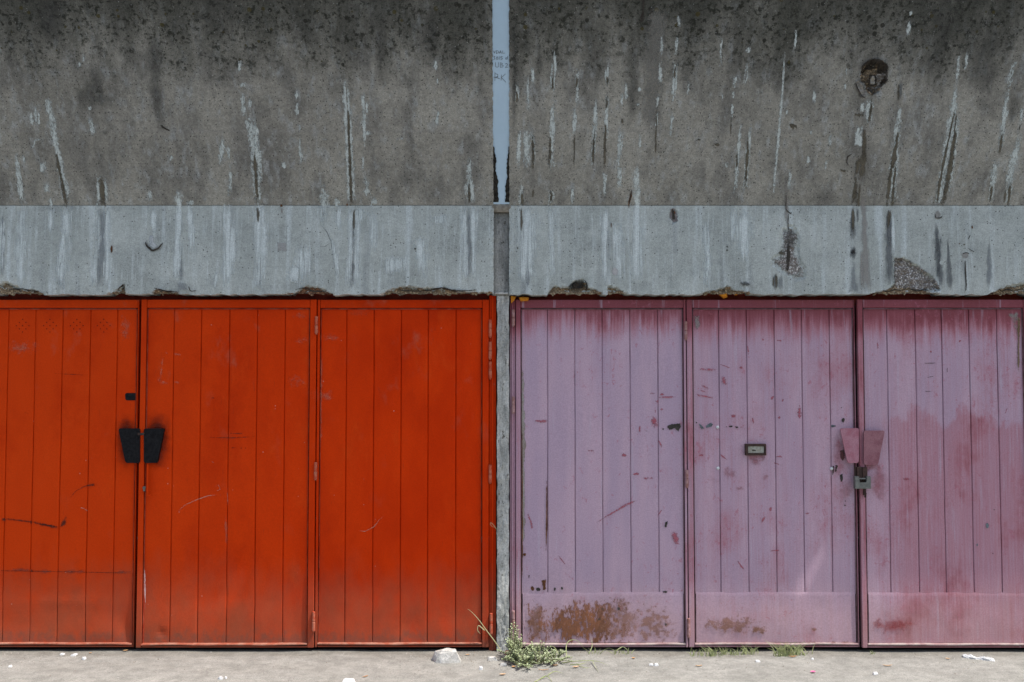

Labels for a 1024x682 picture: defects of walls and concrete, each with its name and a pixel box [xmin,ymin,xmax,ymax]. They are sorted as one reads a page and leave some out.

damp [238,61,267,285]
damp [319,81,377,282]
spalling [385,287,492,296]
spalling [549,280,624,296]
damp [591,14,689,279]
spalling [773,229,804,277]
damp [846,101,874,290]
damp [886,84,902,278]
spalling [873,258,939,296]
damp [935,55,968,286]
rust [526,599,673,643]
rust [705,617,765,634]